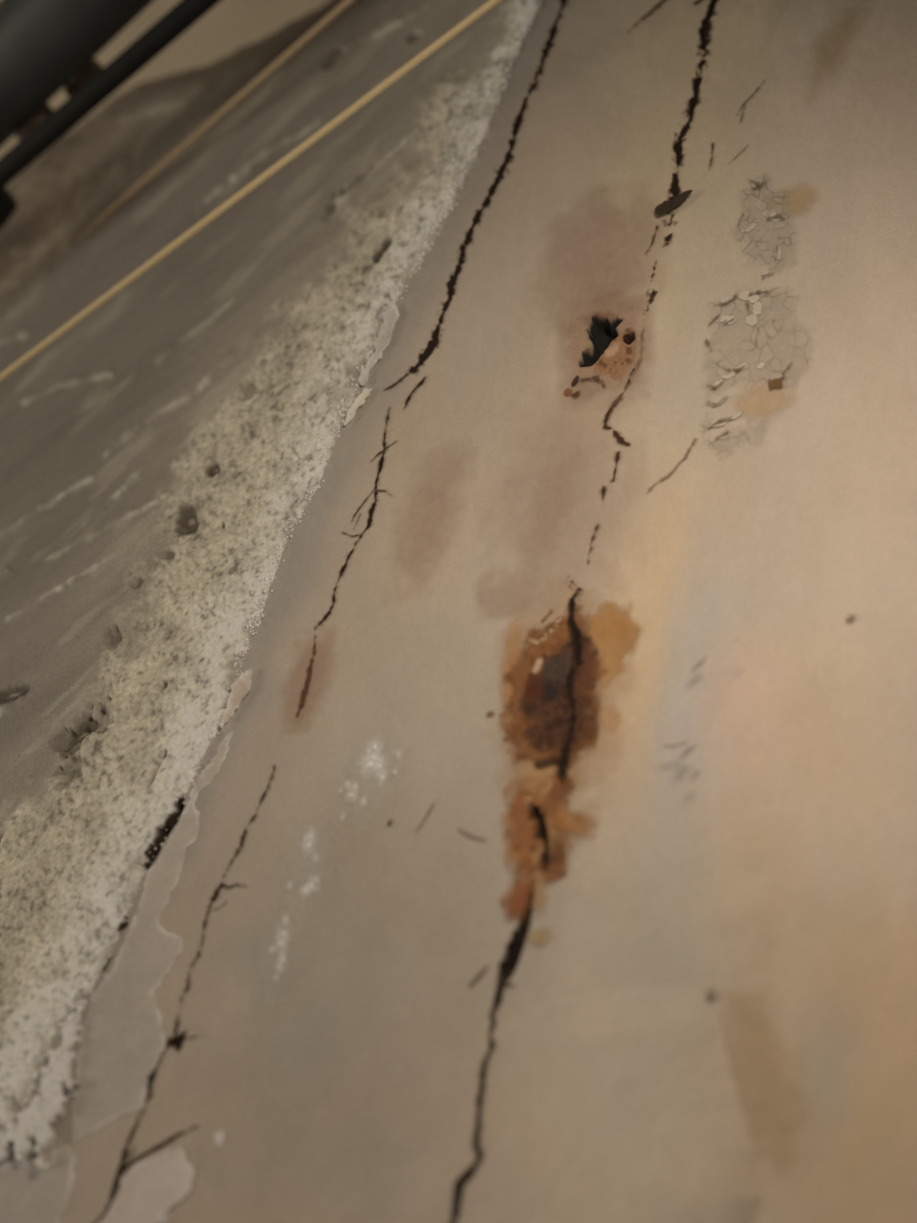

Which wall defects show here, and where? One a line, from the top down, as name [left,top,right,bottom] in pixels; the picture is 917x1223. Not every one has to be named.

crack [314,0,567,629]
crack [588,0,764,564]
peeling [702,175,810,453]
peeling [0,669,253,1223]
crack [94,766,276,1223]
crack [451,880,535,1223]
rust [487,576,639,918]